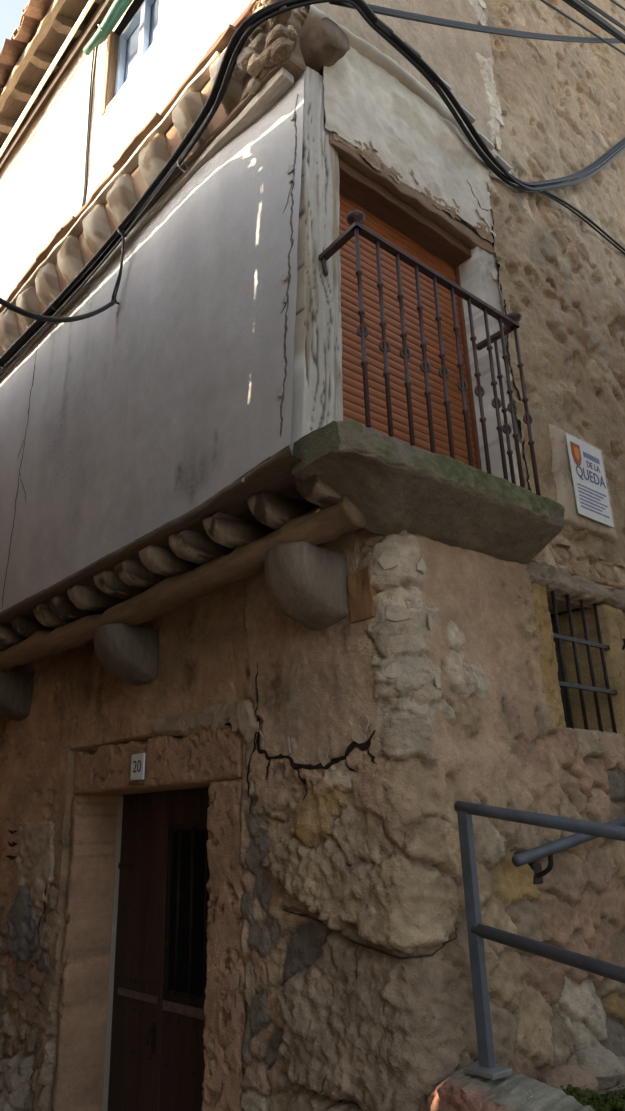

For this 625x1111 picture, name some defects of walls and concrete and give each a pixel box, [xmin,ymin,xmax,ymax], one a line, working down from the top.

flaking render [475,52,505,151]
flaking render [333,132,494,243]
crack [247,663,377,815]